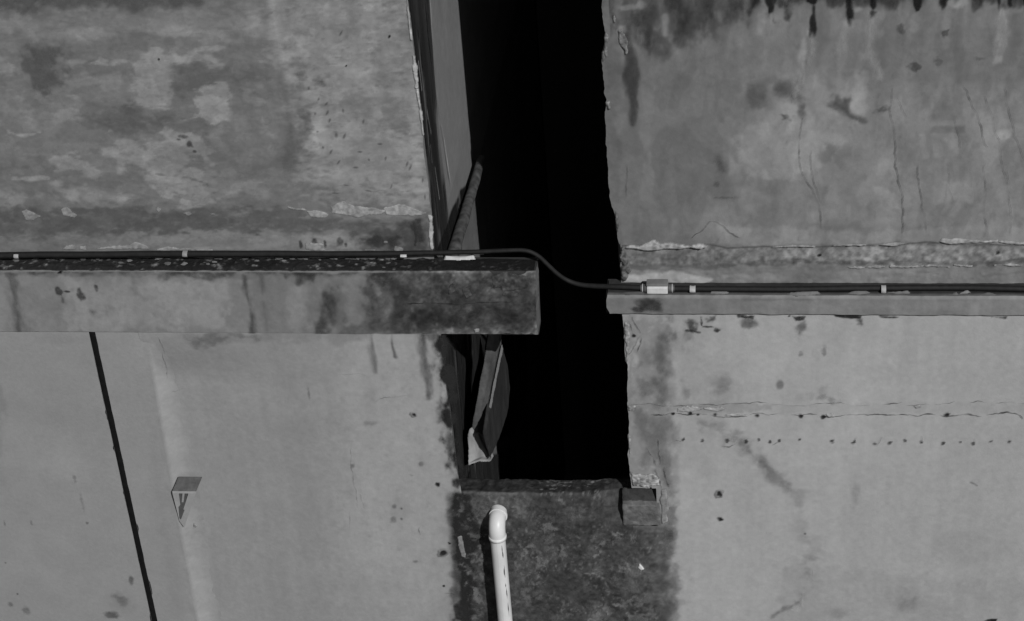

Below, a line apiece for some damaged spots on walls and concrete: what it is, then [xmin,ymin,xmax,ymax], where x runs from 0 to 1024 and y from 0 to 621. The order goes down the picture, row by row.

leakage [733,0,790,18]
leakage [807,0,817,55]
leakage [832,0,854,61]
spalling [412,55,424,135]
leakage [624,34,639,122]
flaking render [288,201,434,249]